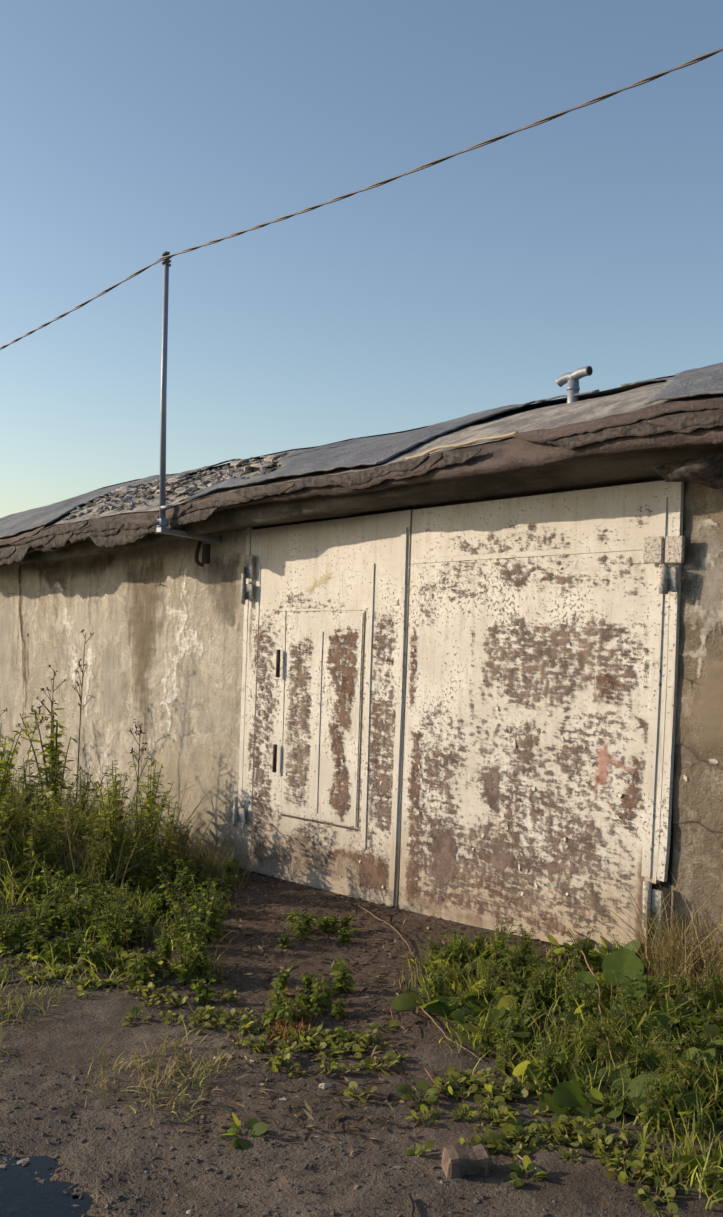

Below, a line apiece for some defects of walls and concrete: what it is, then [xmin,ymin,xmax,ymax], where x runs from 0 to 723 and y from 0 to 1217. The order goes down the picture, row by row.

spalling [63,452,291,520]
water stain [127,560,214,733]
peeling [245,507,653,941]
water stain [679,549,723,678]